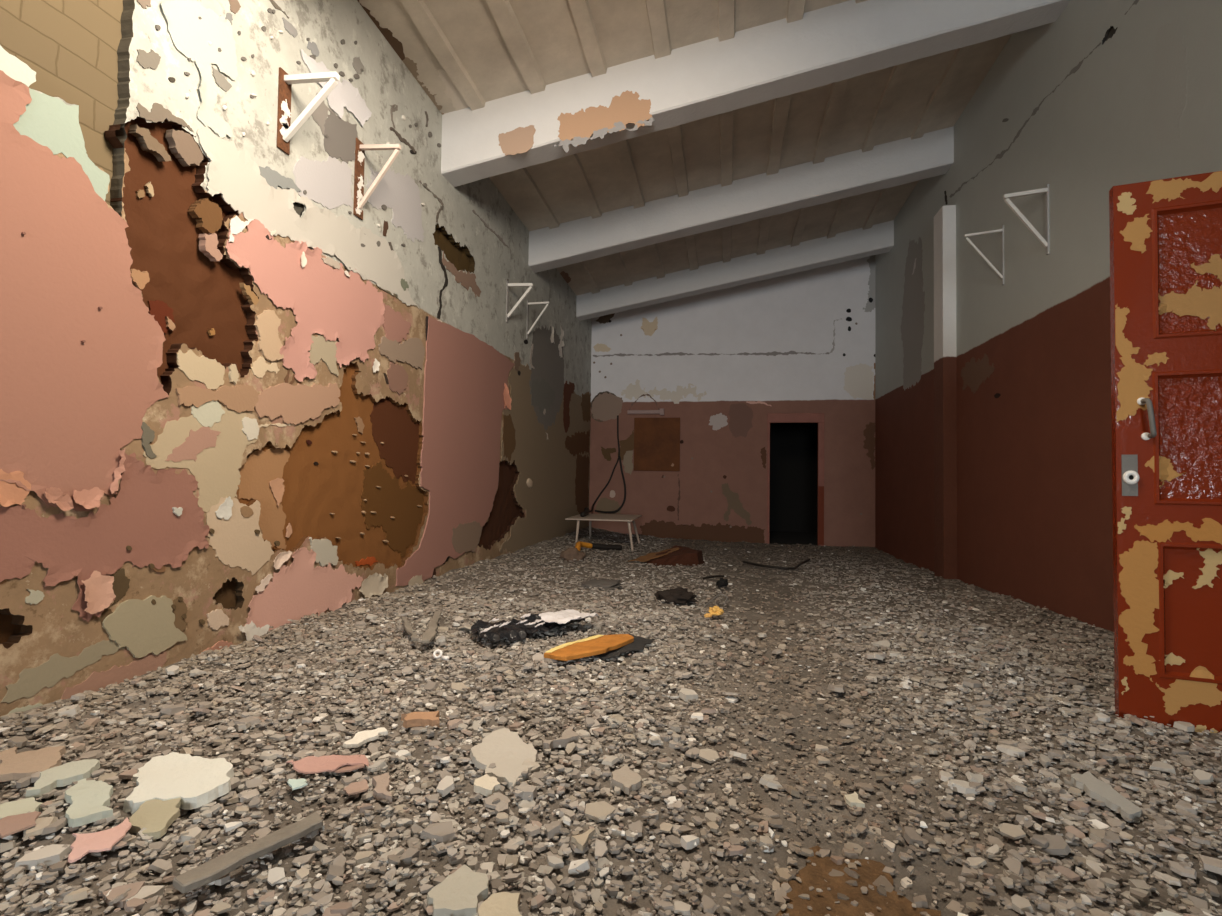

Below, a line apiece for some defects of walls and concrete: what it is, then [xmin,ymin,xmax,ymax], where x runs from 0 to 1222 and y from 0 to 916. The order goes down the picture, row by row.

spalling [554,90,655,153]
crack [944,42,1101,205]
flaking render [0,0,428,614]
crack [376,104,509,341]
hole [433,223,475,273]
peeling [1117,171,1222,253]
peeling [1158,254,1222,331]
peeling [1115,305,1169,422]
flaking render [478,460,525,550]
flaking render [0,608,33,649]
peeling [1117,506,1222,715]
peeling [286,755,369,795]